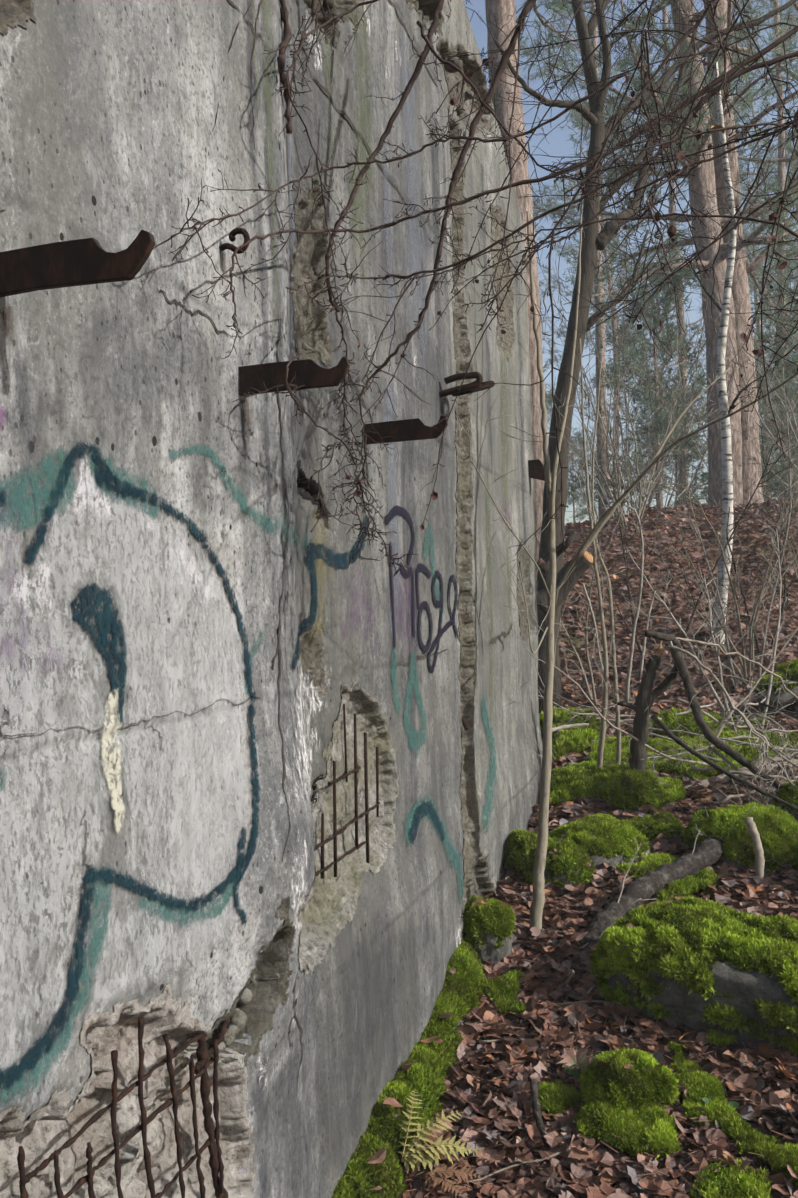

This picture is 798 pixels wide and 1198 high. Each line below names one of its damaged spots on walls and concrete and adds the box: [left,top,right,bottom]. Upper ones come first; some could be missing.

spalling [0,0,37,36]
spalling [303,0,358,48]
crack [275,319,283,362]
spalling [290,174,332,367]
spalling [406,0,498,940]
crack [0,392,329,862]
spalling [292,626,399,979]
spalling [0,983,266,1198]